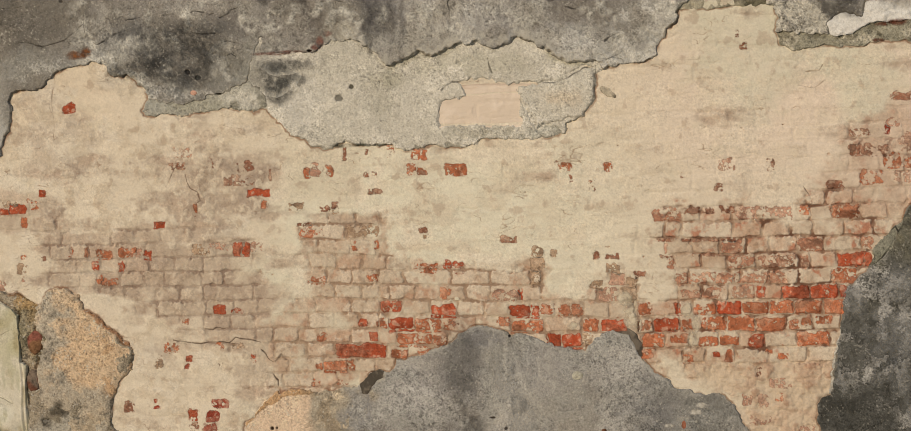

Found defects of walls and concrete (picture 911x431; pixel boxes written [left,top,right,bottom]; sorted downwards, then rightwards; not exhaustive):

peeling [62,102,76,114]
spalling [142,37,604,177]
peeling [848,117,911,185]
peeling [224,160,272,209]
peeling [0,190,46,228]
peeling [651,205,810,222]
peeling [68,247,152,286]
peeling [416,260,464,274]
peeling [492,220,903,394]
peeling [155,343,193,369]
spalling [245,287,459,431]
peeling [188,398,229,431]